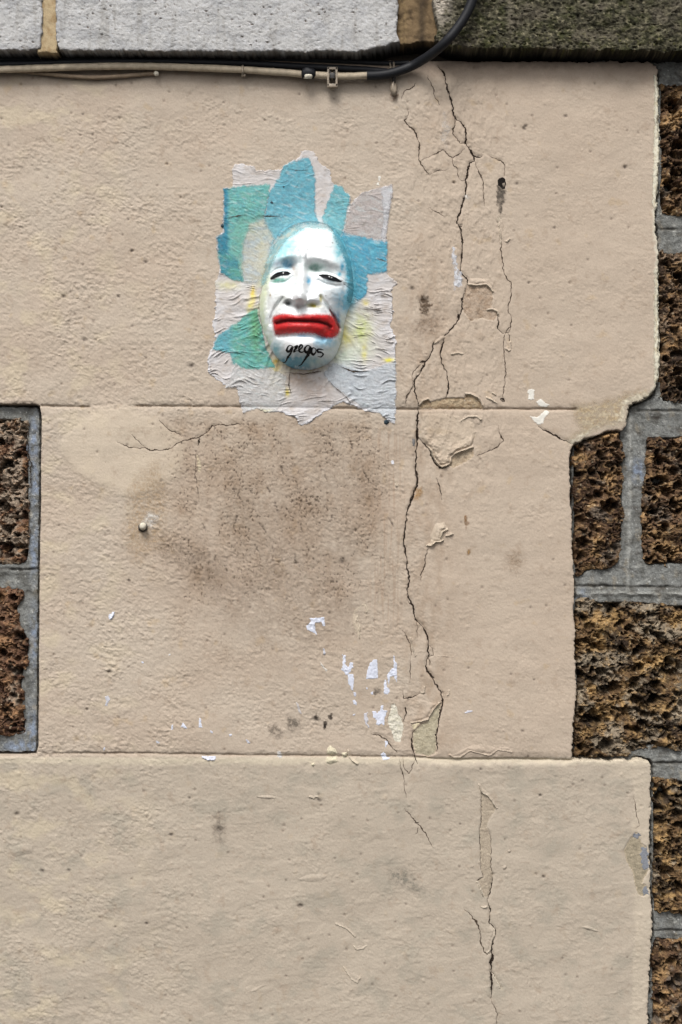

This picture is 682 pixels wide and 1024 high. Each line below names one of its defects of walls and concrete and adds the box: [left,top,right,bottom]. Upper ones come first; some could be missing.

crack [118,420,244,494]
crack [373,67,512,845]
peeling [419,392,497,468]
spalling [388,682,441,756]
crack [465,793,498,1024]